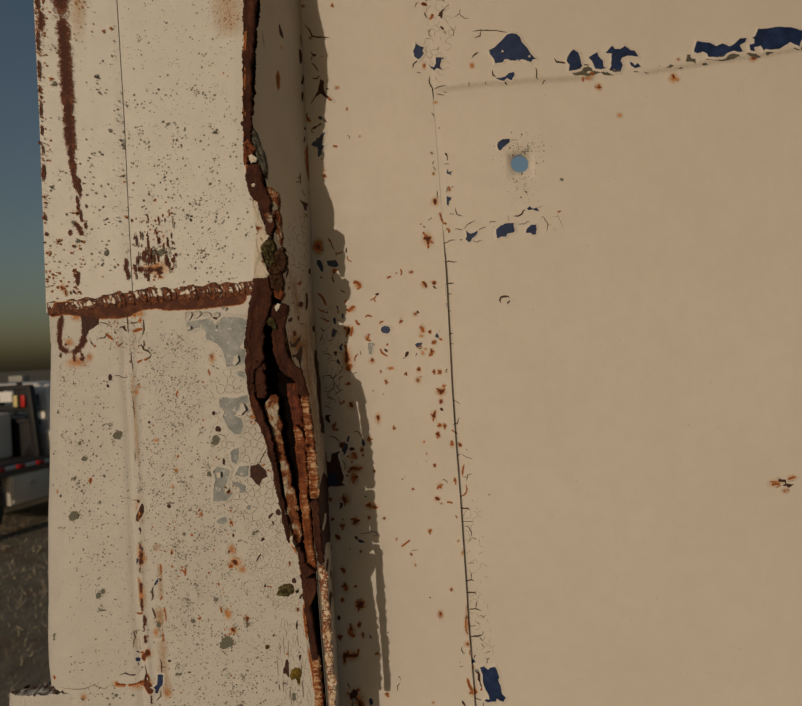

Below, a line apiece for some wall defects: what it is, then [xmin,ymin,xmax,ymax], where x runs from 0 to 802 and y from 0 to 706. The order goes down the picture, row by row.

crack [415,0,488,116]
peeling [475,30,539,85]
peeling [554,42,644,77]
peeling [659,24,802,69]
corrosion [34,0,247,366]
peeling [183,306,247,380]
crack [213,0,361,706]
crack [423,208,462,433]
corrosion [431,385,462,447]
corrosion [136,544,164,661]
crack [443,454,494,667]
corrosion [115,673,154,704]